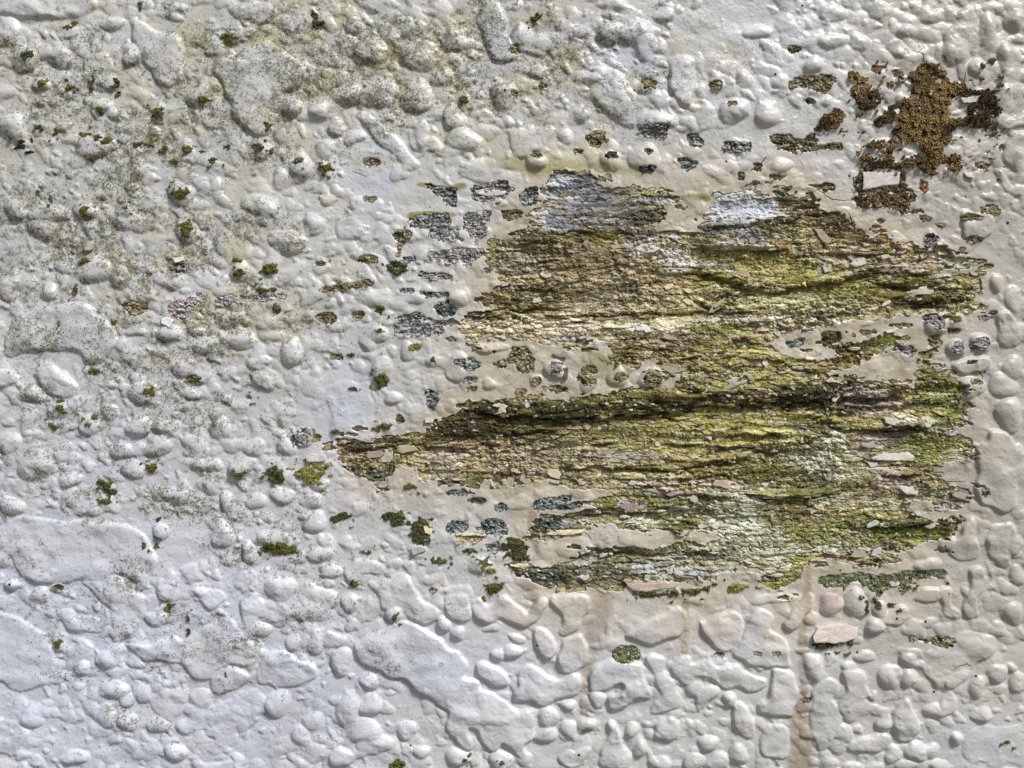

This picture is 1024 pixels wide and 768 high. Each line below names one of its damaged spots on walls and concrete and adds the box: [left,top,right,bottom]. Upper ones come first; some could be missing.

peeling [871,65,904,75]
peeling [786,74,837,105]
peeling [960,95,980,103]
peeling [984,126,998,138]
peeling [769,133,843,155]
peeling [290,141,1001,604]